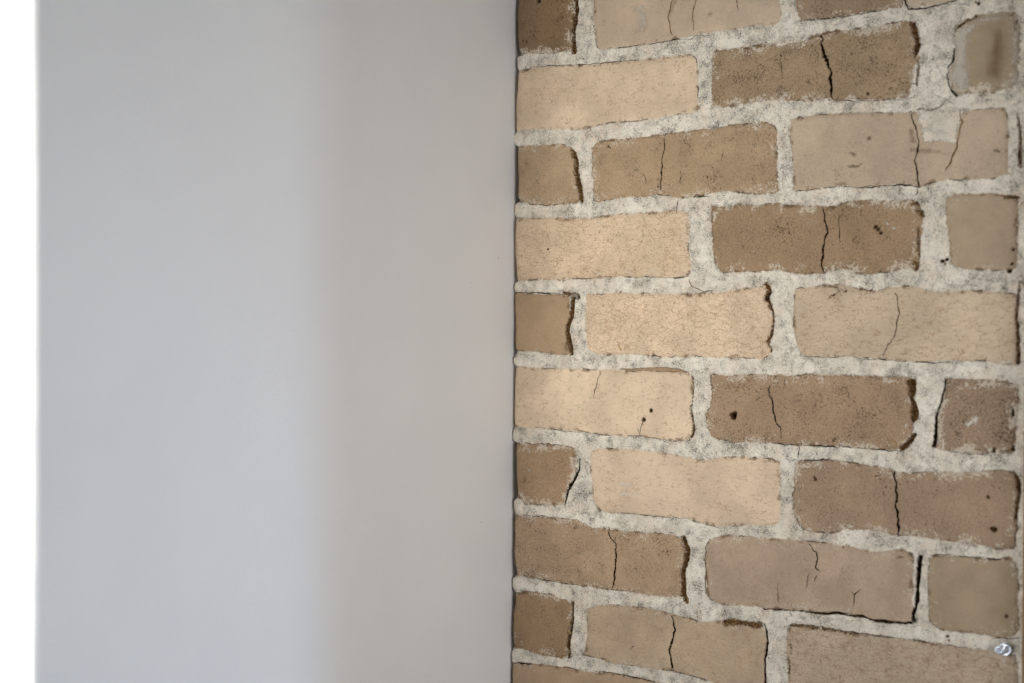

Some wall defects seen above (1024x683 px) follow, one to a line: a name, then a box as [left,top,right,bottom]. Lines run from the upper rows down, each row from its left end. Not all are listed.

crack [797,0,963,274]
crack [641,141,709,213]
crack [791,293,943,364]
crack [763,380,900,534]
crack [608,513,718,591]
crack [668,616,676,668]